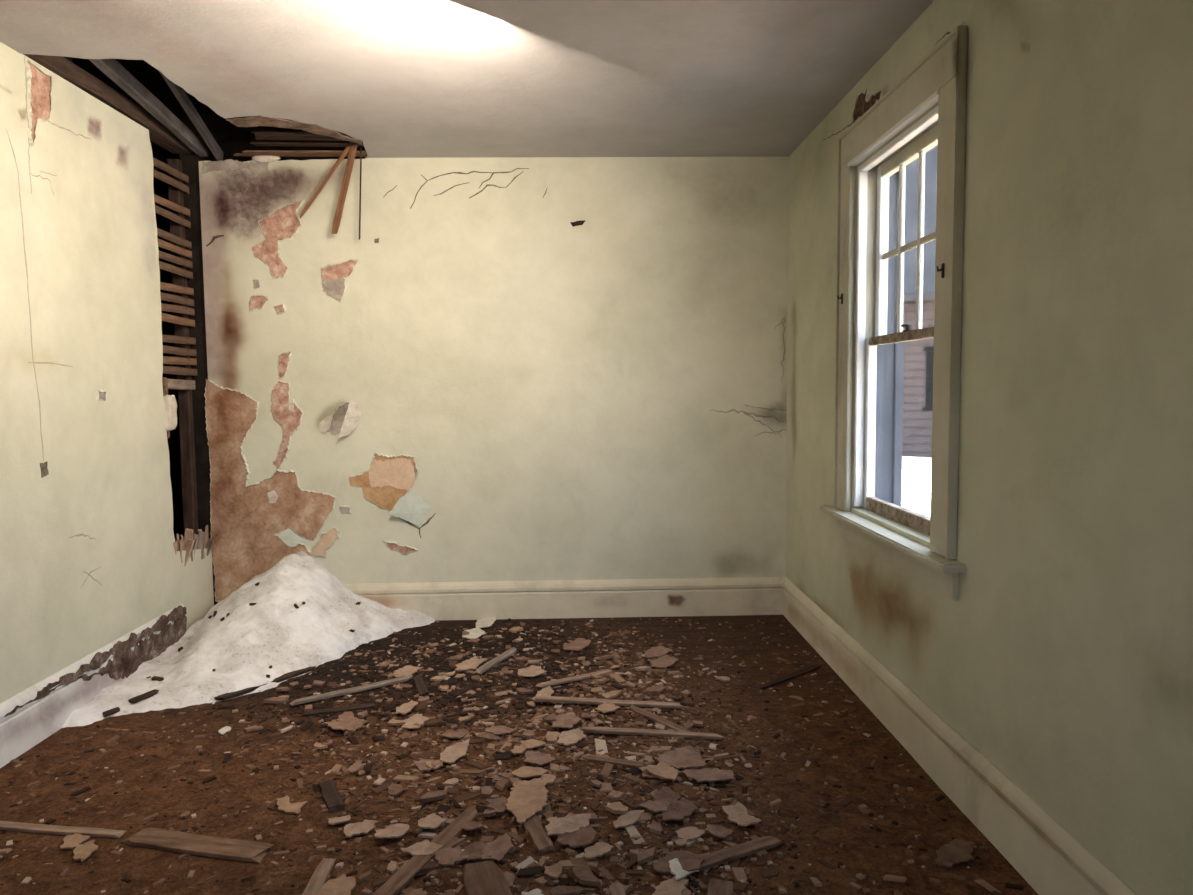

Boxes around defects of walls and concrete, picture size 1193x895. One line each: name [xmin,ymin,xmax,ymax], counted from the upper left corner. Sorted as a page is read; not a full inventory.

peeling [25,58,52,147]
crack [383,168,547,209]
peeling [320,258,359,303]
peeling [150,126,352,606]
crack [774,316,786,381]
peeling [94,388,106,401]
peeling [319,400,361,438]
crack [710,404,787,438]
peeling [40,461,49,478]
peeling [348,452,431,527]
peeling [383,539,418,555]
peeling [4,605,187,717]